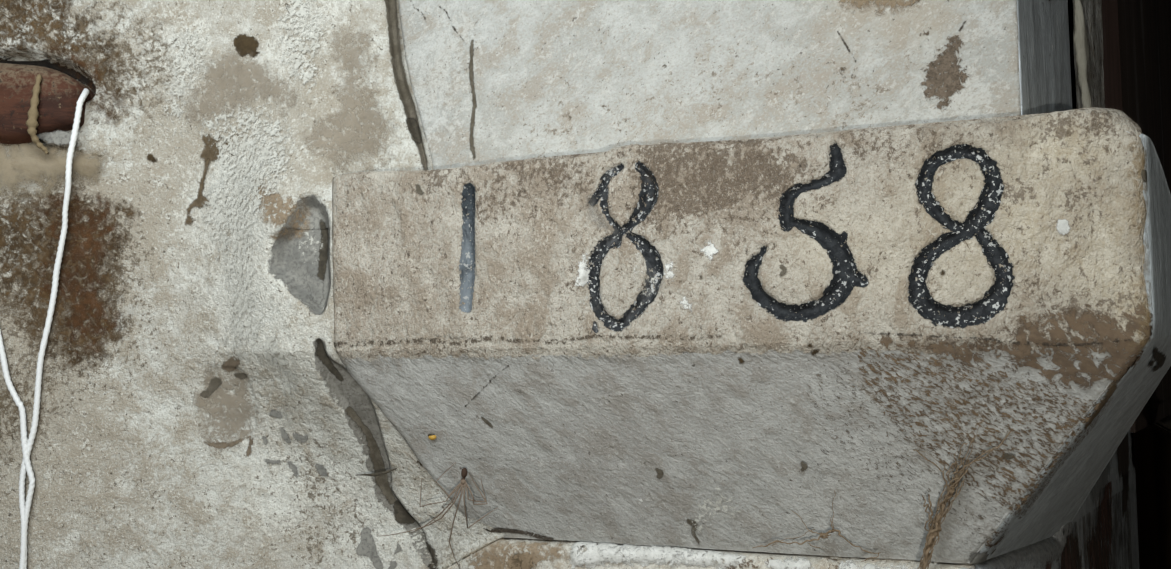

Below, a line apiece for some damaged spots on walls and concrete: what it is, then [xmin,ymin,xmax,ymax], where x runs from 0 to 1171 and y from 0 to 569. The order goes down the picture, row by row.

water stain [0,0,178,121]
crack [384,0,477,171]
water stain [0,177,134,372]
water stain [0,378,56,441]
peeling [806,297,1153,569]